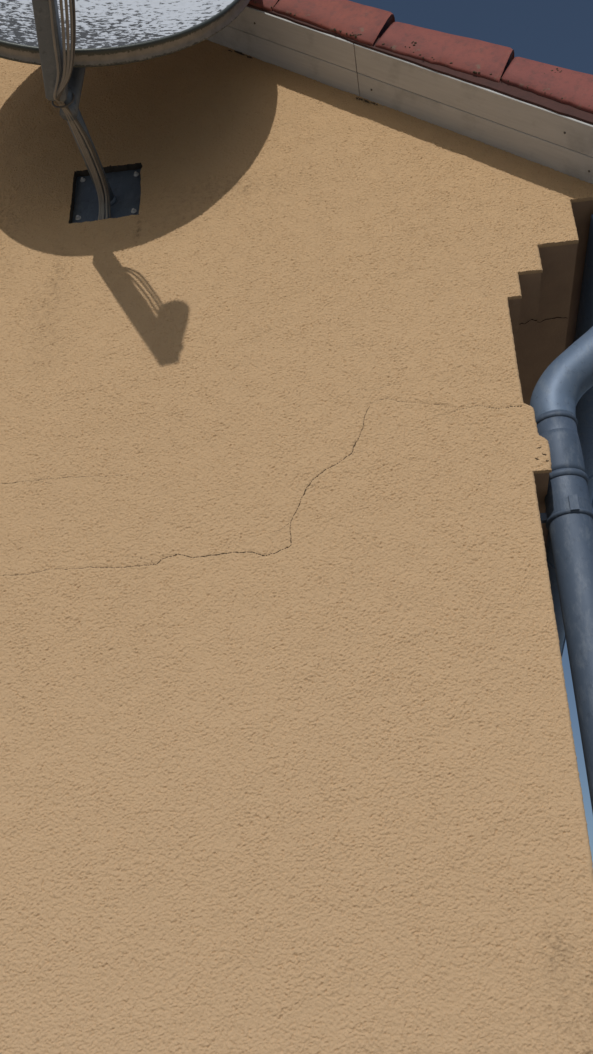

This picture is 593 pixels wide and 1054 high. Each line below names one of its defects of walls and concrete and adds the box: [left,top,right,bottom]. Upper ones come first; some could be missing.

crack [0,385,521,576]